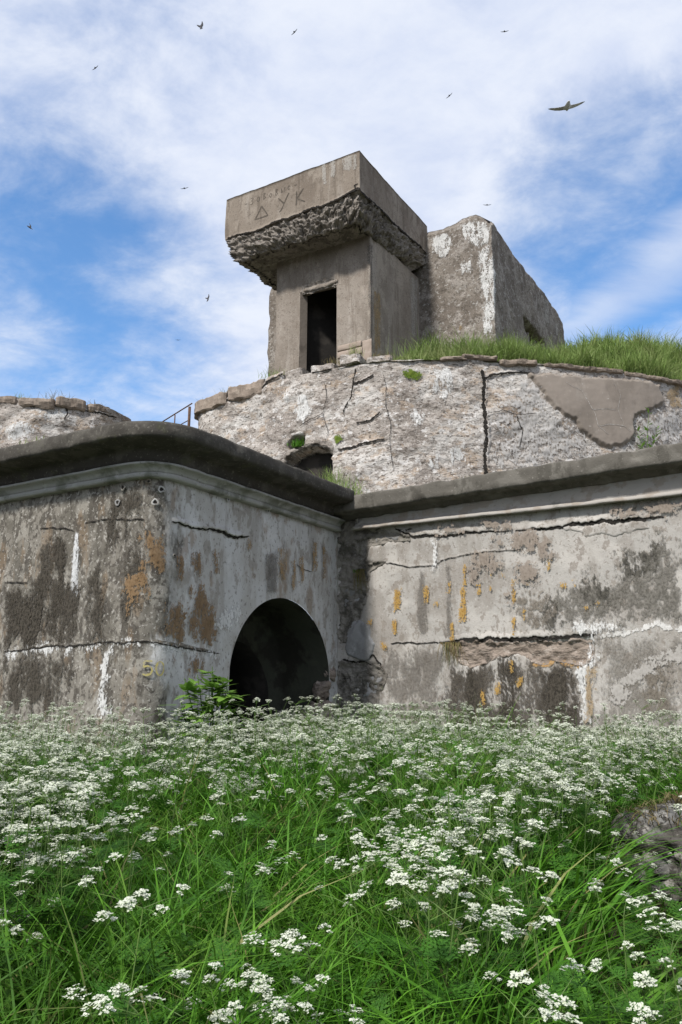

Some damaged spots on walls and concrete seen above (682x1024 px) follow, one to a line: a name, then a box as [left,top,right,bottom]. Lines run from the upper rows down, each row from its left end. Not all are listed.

spalling [226,190,426,291]
efflorescence [431,221,496,335]
crack [224,368,393,467]
crack [480,369,530,474]
peeling [527,372,664,449]
crack [386,512,666,568]
leakage [0,533,216,718]
spalling [270,521,411,739]
corrosion [380,588,402,651]
crack [338,627,597,681]
corrosion [448,563,527,642]
leakage [377,529,682,737]